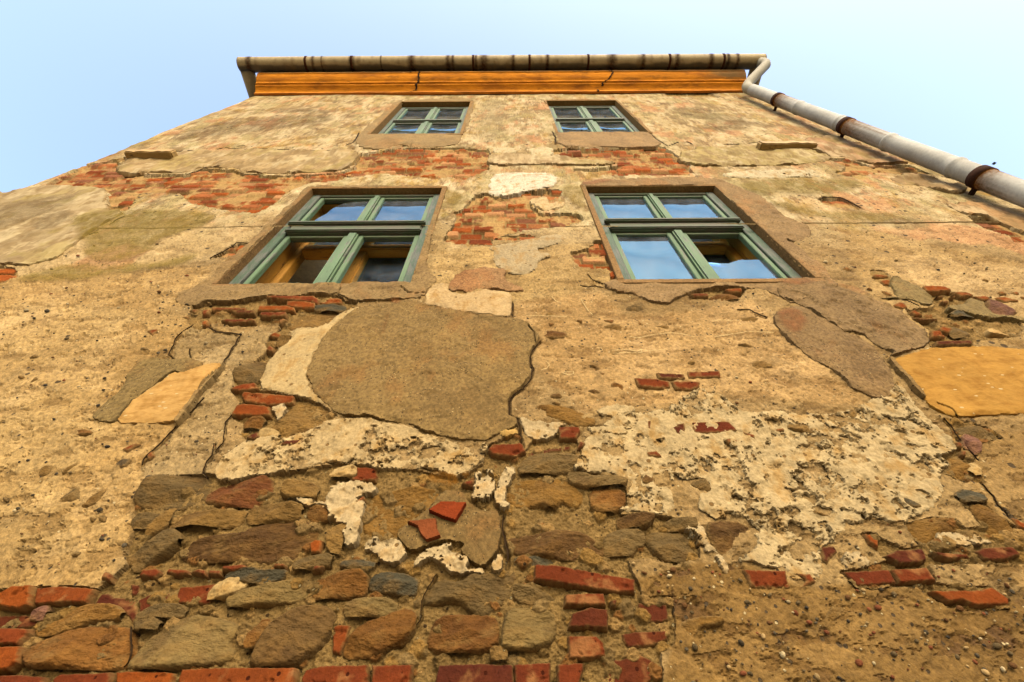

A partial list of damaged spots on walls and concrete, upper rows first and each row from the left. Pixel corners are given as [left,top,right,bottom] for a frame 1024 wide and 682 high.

flaking render [0,135,1024,283]
crack [168,325,241,362]
spalling [181,295,357,446]
crack [509,304,540,444]
spalling [867,270,1024,348]
crack [142,398,204,465]
crack [202,414,232,480]
spalling [775,424,813,434]
spalling [0,393,755,682]
spalling [742,570,815,590]
spalling [820,546,837,565]
spalling [840,417,1024,611]